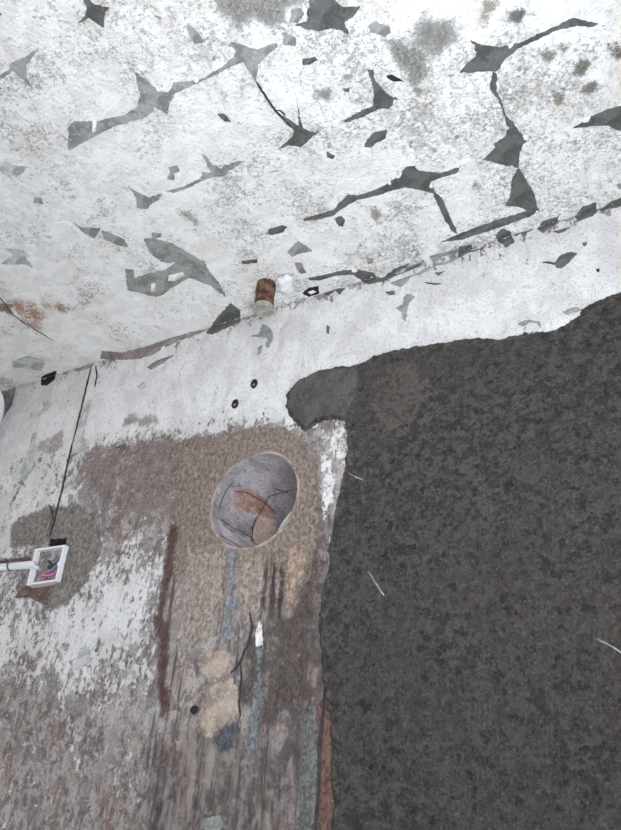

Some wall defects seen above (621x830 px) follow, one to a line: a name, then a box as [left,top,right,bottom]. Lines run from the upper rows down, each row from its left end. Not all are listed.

peeling [187,23,203,44]
peeling [289,0,360,35]
peeling [0,49,38,90]
peeling [67,32,296,150]
peeling [274,106,320,150]
peeling [573,106,621,131]
peeling [287,18,598,322]
peeling [575,183,621,222]
peeling [100,232,241,370]
damp [10,413,322,830]
rust [315,700,334,830]